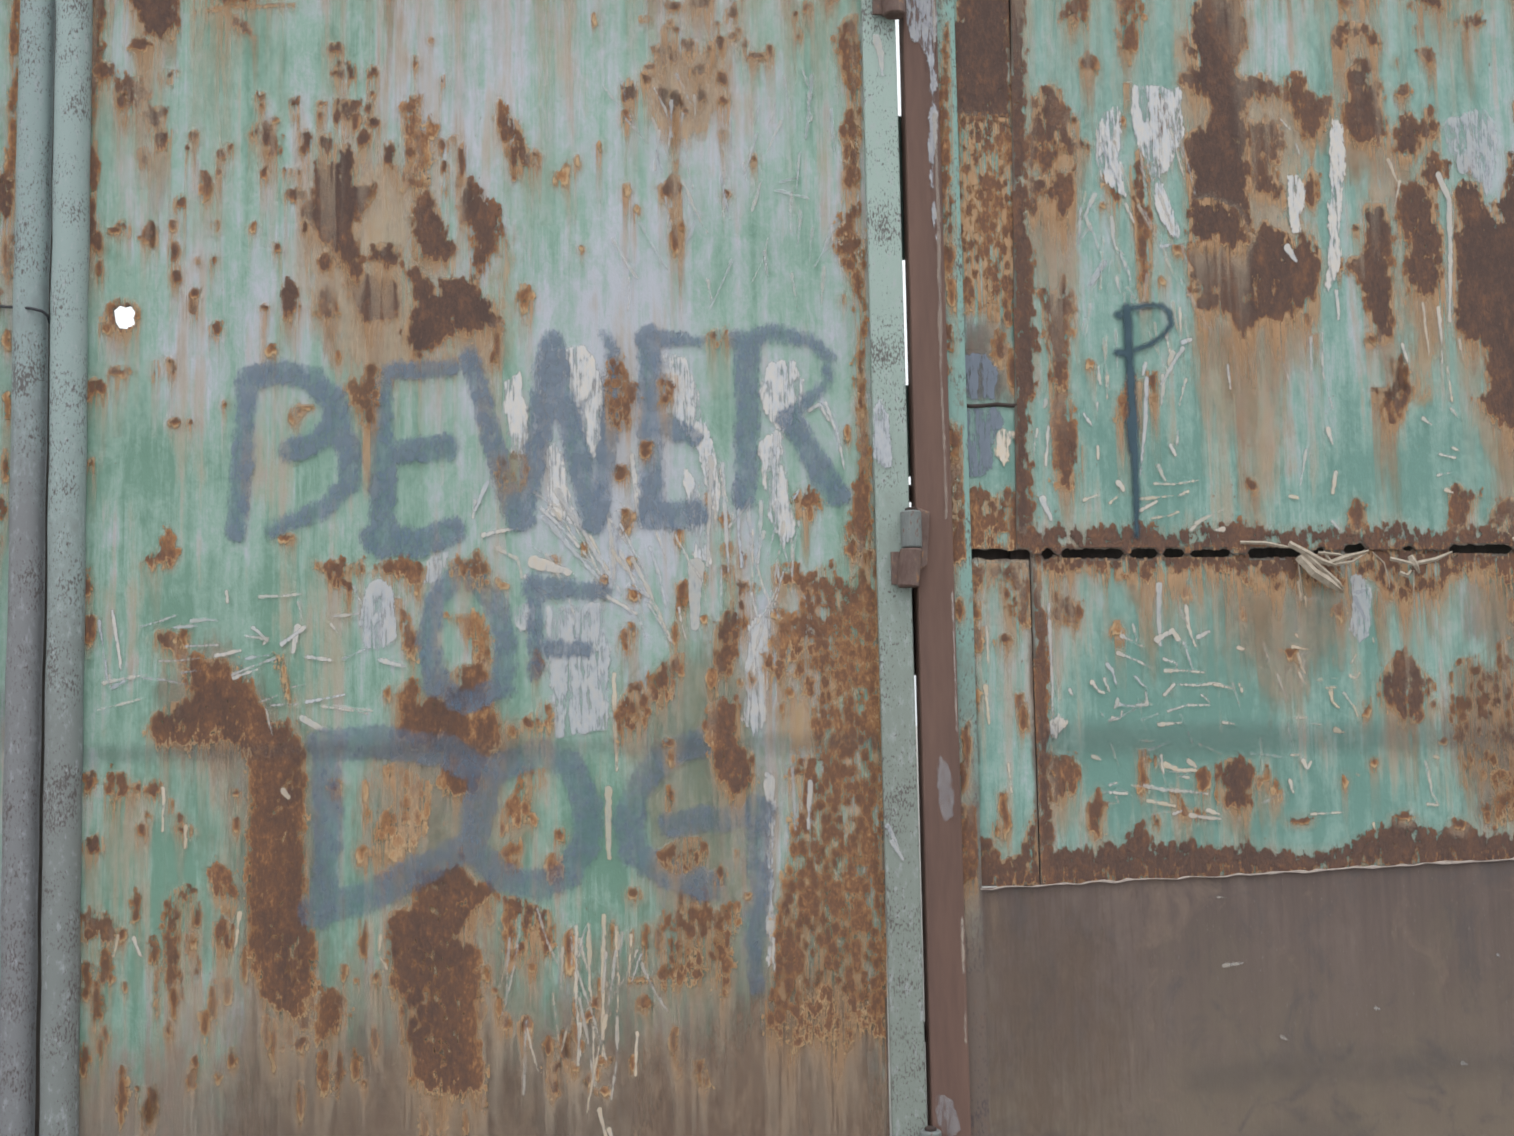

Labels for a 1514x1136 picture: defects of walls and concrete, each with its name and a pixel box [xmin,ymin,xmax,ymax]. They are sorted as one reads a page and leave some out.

rust [0,0,20,310]
peeling [1098,106,1127,197]
peeling [1154,181,1180,238]
peeling [1287,175,1306,234]
rust [1,328,12,353]
rust [1,391,11,425]
rust [939,0,1514,897]
rust [0,449,10,538]
rust [79,0,887,1136]